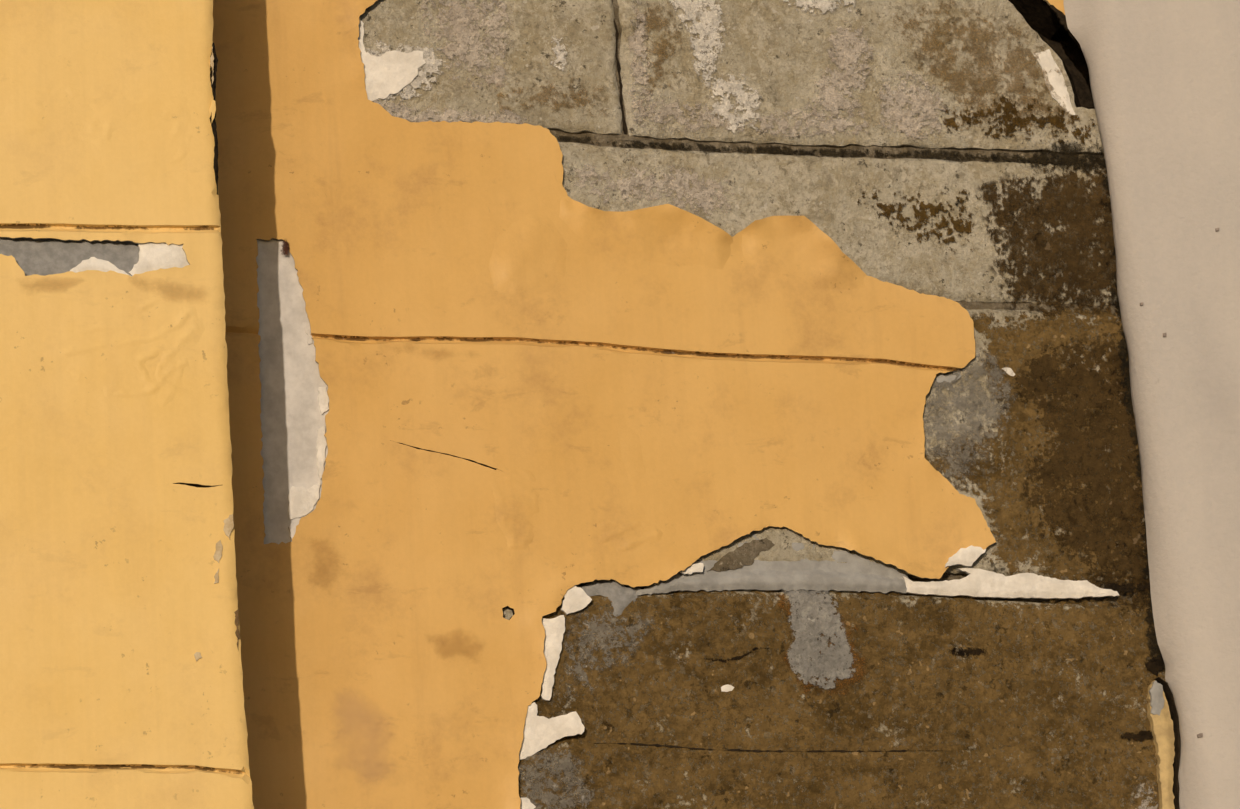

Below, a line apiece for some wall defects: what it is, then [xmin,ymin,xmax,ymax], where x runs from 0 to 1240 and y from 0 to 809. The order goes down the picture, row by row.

crack [1008,0,1095,109]
peeling [0,238,189,277]
peeling [256,238,329,544]
crack [390,440,503,472]
peeling [358,0,1165,809]
damp [518,0,1166,809]
spalling [213,514,234,584]